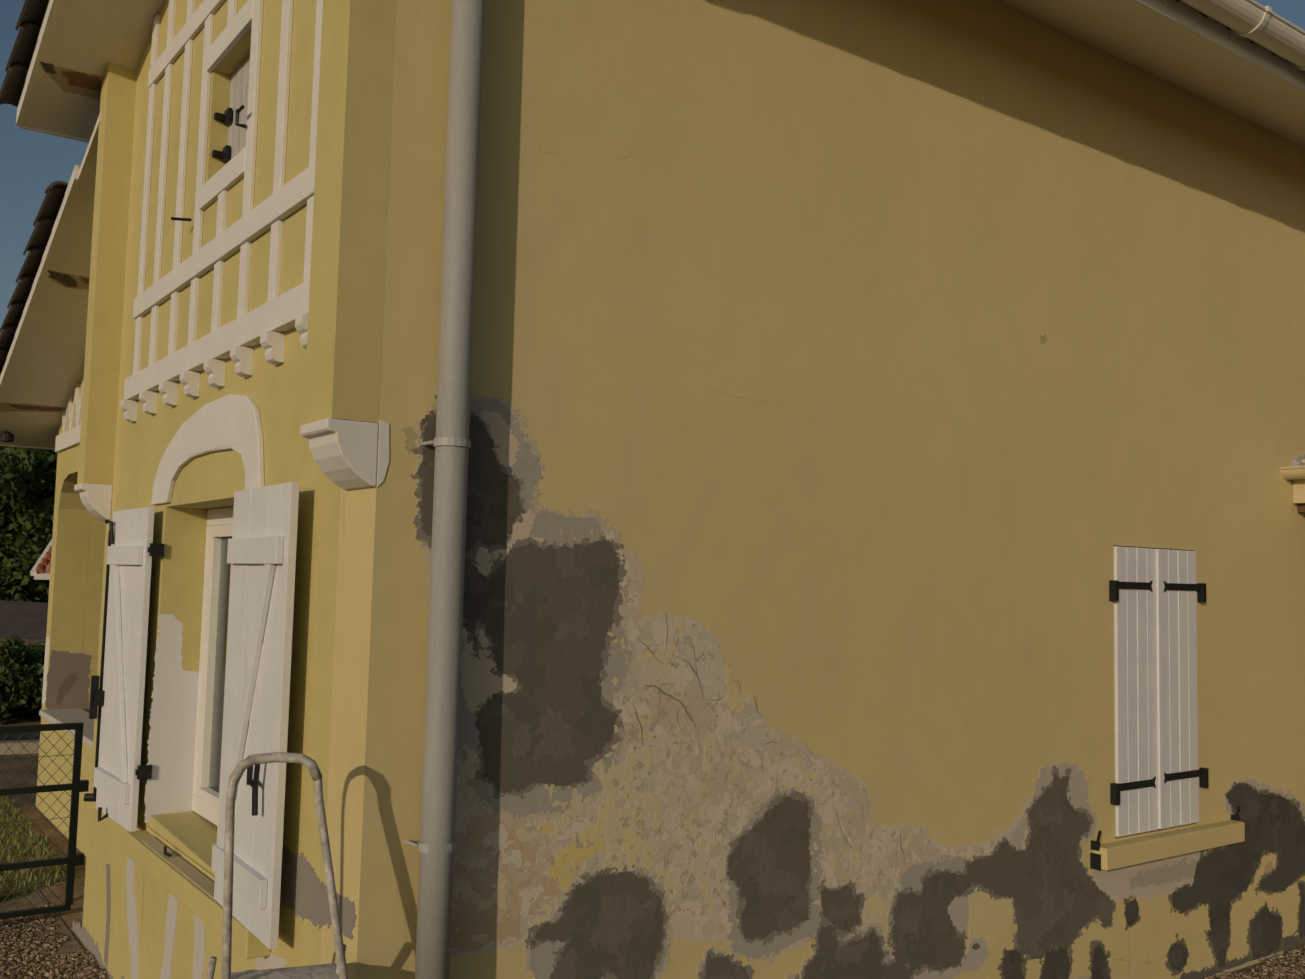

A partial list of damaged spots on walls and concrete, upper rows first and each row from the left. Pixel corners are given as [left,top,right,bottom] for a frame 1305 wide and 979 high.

peeling [42,62,104,100]
flaking render [480,410,520,467]
flaking render [474,509,536,577]
flaking render [460,628,517,712]
crack [625,617,816,768]
peeling [452,809,563,947]
flaking render [1092,849,1211,901]